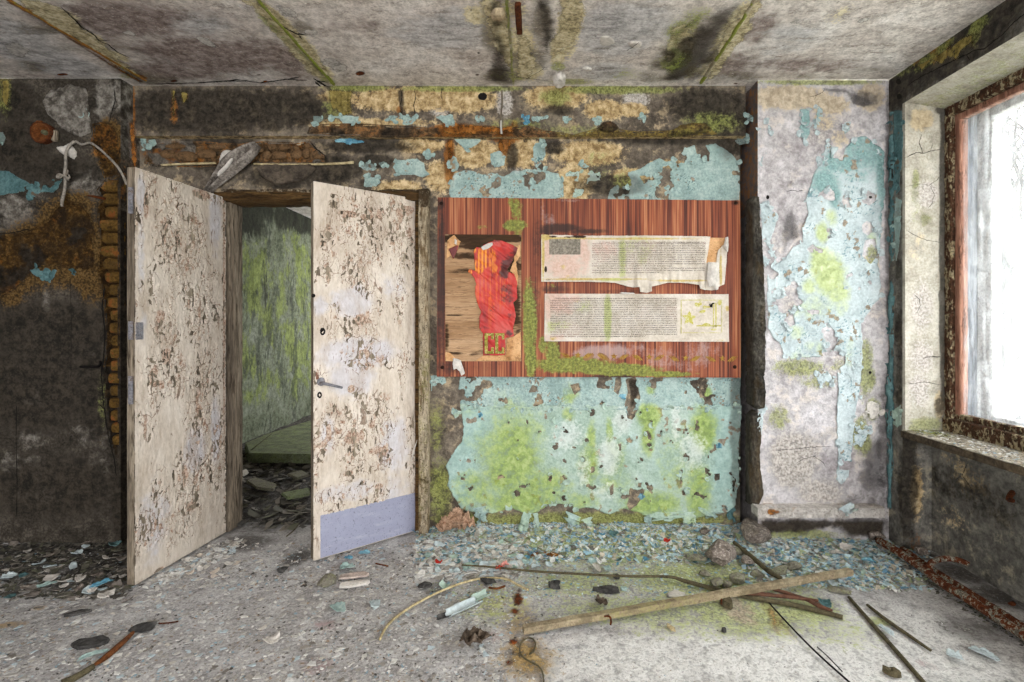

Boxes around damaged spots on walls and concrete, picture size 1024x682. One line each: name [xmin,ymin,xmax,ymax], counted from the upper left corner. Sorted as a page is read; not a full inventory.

leakage [490,2,506,81]
leakage [539,2,552,46]
leakage [664,11,733,80]
flaking render [0,109,126,458]
peeling [140,79,905,573]